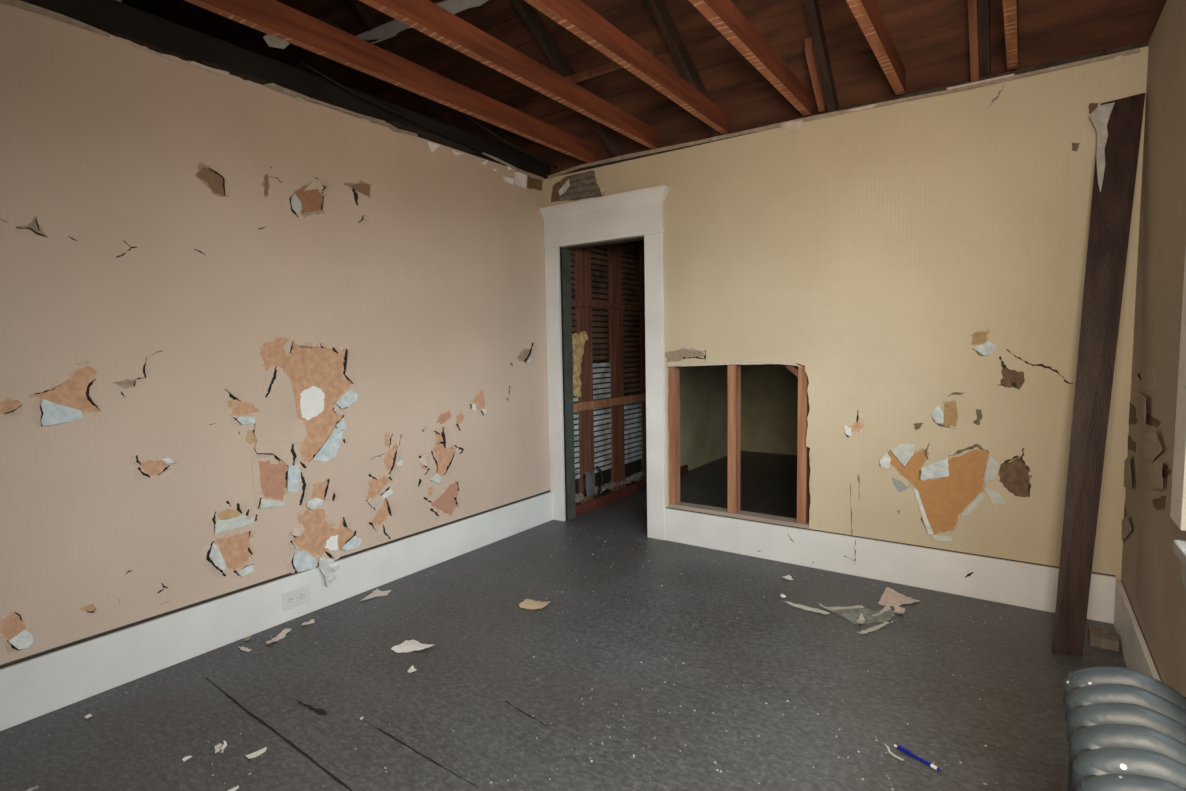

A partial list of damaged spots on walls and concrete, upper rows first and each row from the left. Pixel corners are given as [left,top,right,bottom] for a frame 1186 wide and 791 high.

spalling [0,0,1140,202]
peeling [262,166,372,227]
peeling [0,361,104,426]
peeling [665,348,706,365]
crack [1006,349,1073,384]
peeling [130,455,177,482]
peeling [200,336,404,586]
peeling [414,387,487,520]
peeling [879,392,1032,541]
peeling [0,609,33,654]